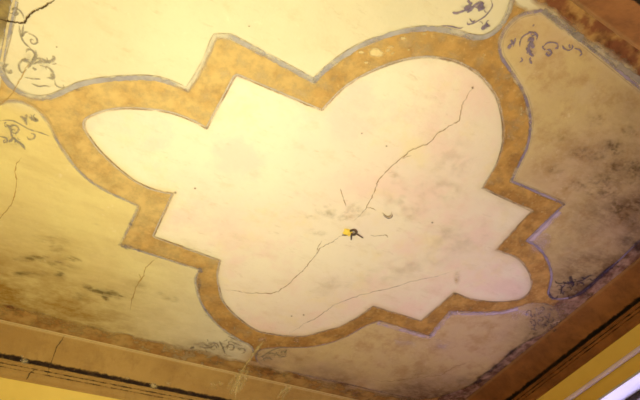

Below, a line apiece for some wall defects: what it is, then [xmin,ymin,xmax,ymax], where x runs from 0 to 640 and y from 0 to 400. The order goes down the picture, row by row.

crack [0,0,55,24]
crack [362,95,468,213]
crack [233,238,338,294]